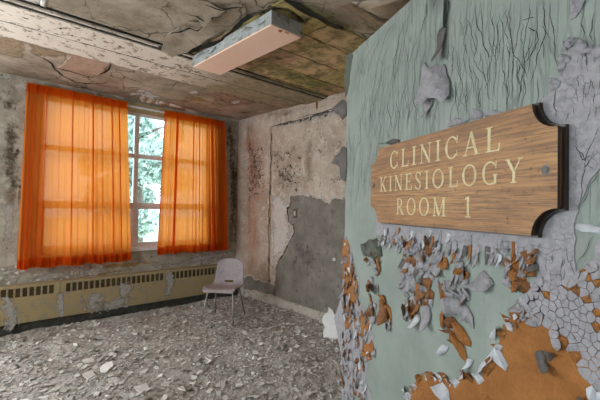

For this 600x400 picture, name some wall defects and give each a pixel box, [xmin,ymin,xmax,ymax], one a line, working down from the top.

crack [30,52,110,84]
spalling [161,0,367,120]
peeling [414,0,450,120]
crack [337,0,558,197]
crack [553,8,600,208]
water stain [4,124,21,204]
water stain [245,141,266,200]
peeling [243,37,600,400]
peeling [1,297,20,331]
peeling [0,265,108,285]
peeling [80,282,134,314]
crack [545,235,598,318]